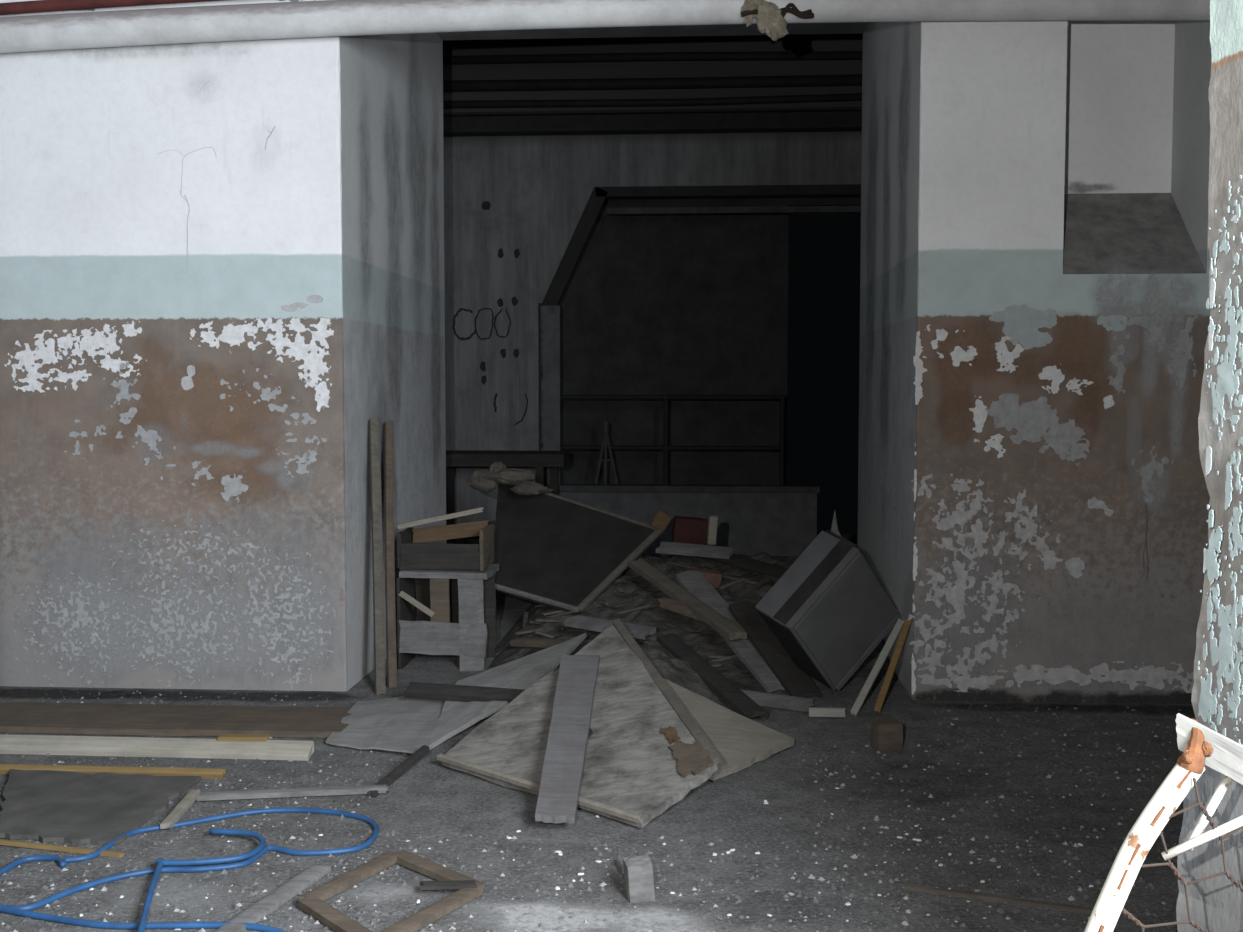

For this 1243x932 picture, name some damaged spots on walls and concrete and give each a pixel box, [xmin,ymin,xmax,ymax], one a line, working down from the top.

peeling [4,321,176,480]
peeling [181,365,195,390]
peeling [178,460,248,503]
peeling [190,295,334,484]
peeling [908,175,1243,745]